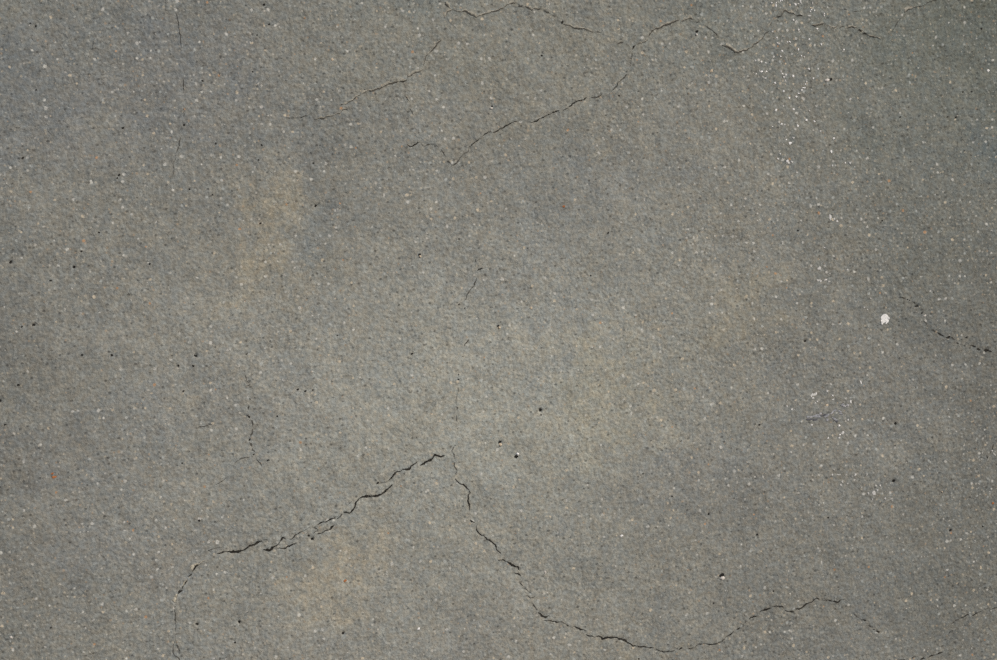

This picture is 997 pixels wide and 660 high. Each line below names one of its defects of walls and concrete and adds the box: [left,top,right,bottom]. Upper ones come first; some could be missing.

crack [286,0,934,172]
crack [899,297,991,352]
crack [172,339,880,660]
crack [901,607,996,660]